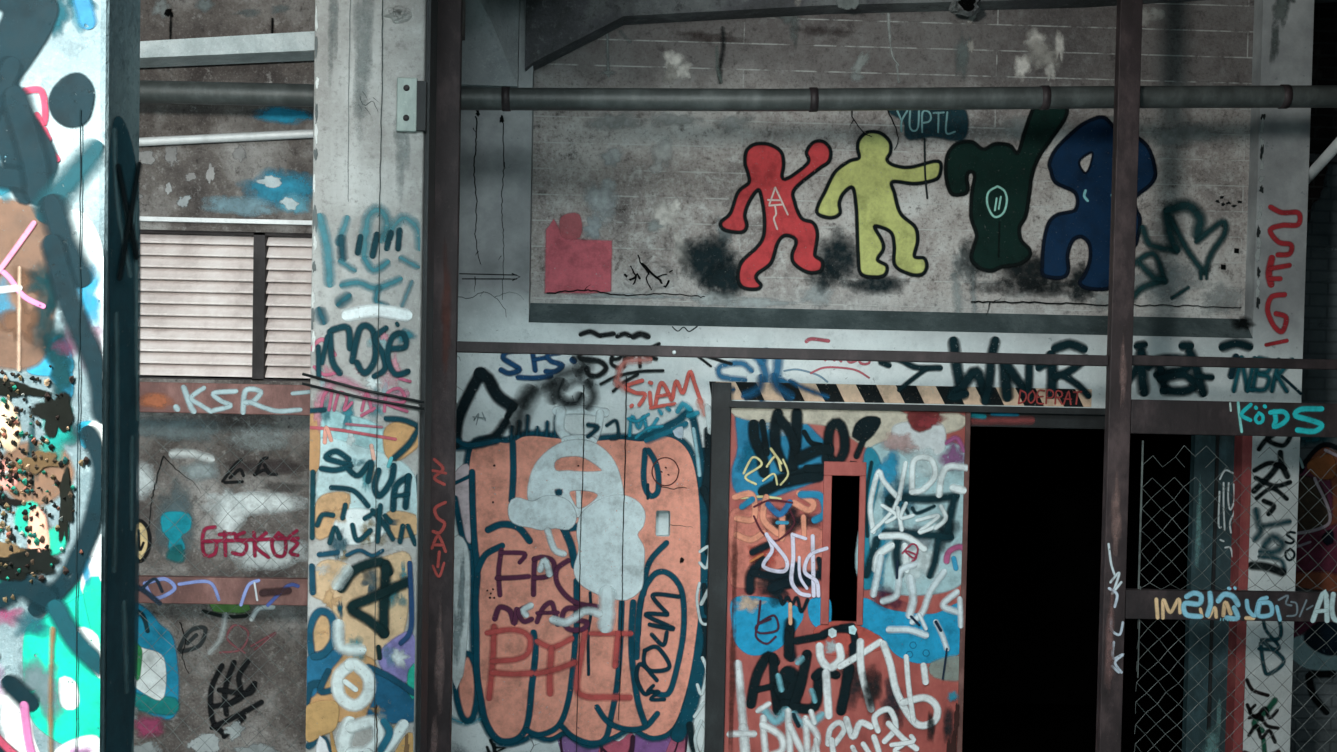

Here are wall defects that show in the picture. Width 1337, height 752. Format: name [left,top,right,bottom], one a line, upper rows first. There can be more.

corrosion [435,615,444,698]